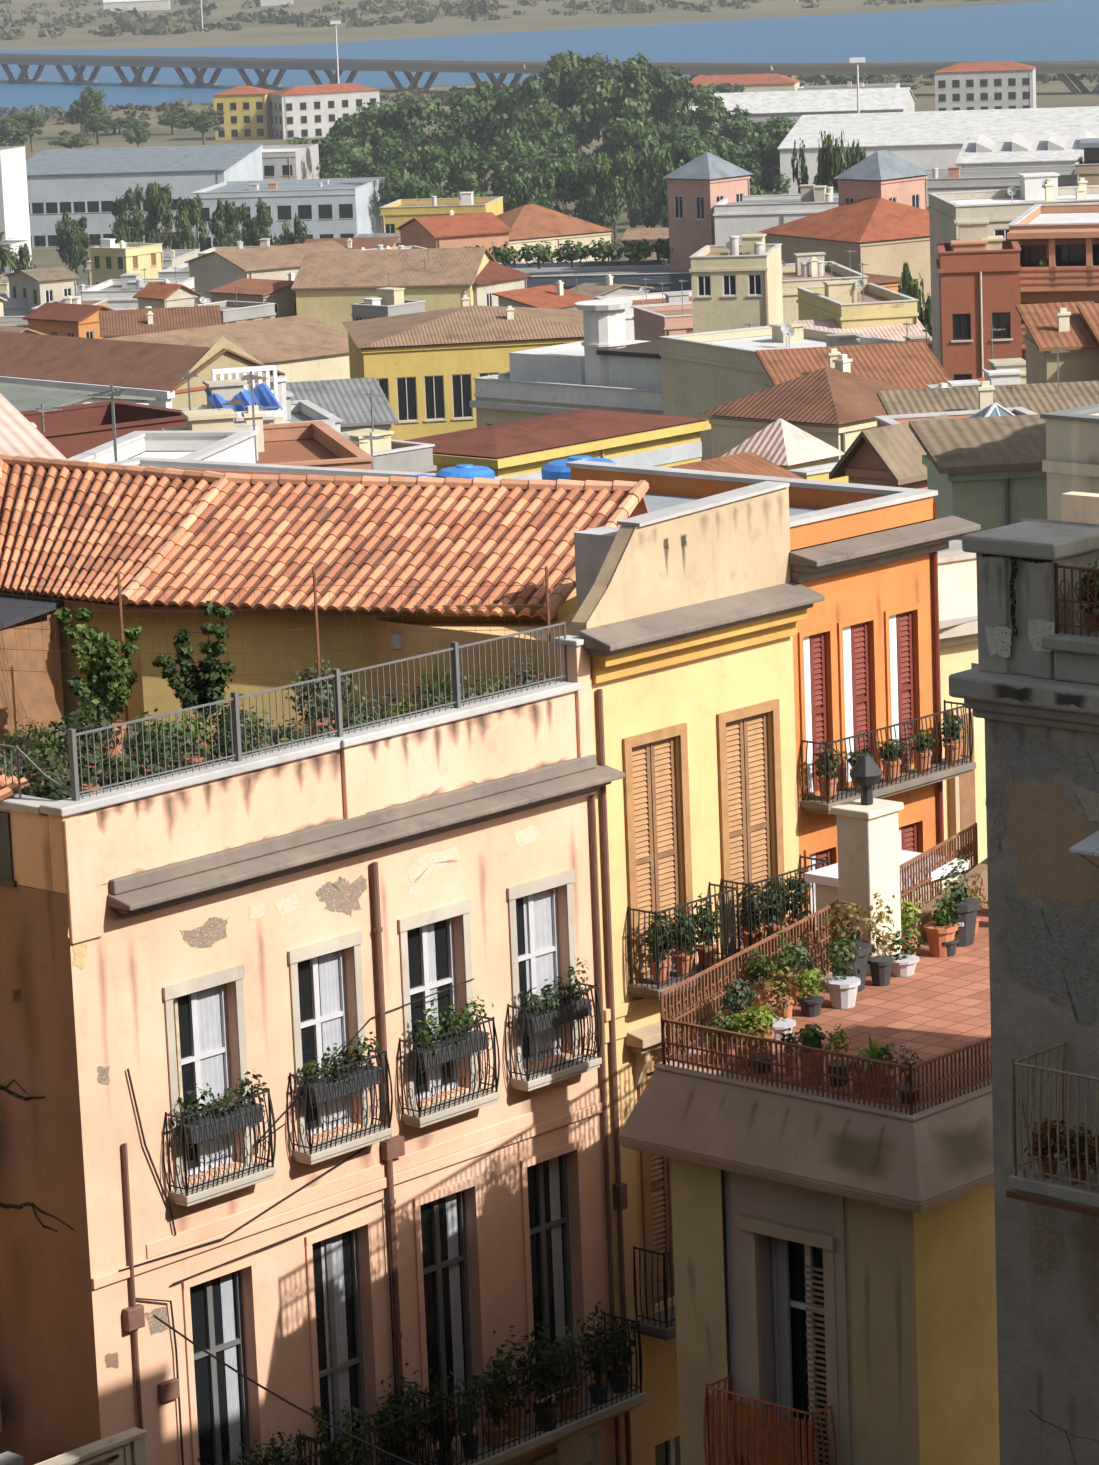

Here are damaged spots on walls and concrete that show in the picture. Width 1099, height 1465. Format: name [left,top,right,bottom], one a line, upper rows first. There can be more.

water stain [372,702,550,750]
water stain [245,754,338,790]
water stain [86,791,183,821]
spalling [985,789,1007,863]
peeling [316,875,367,916]
peeling [180,917,229,948]
spalling [994,888,1099,1027]
crack [0,1079,45,1102]
crack [0,1202,75,1232]
crack [1029,1409,1099,1463]